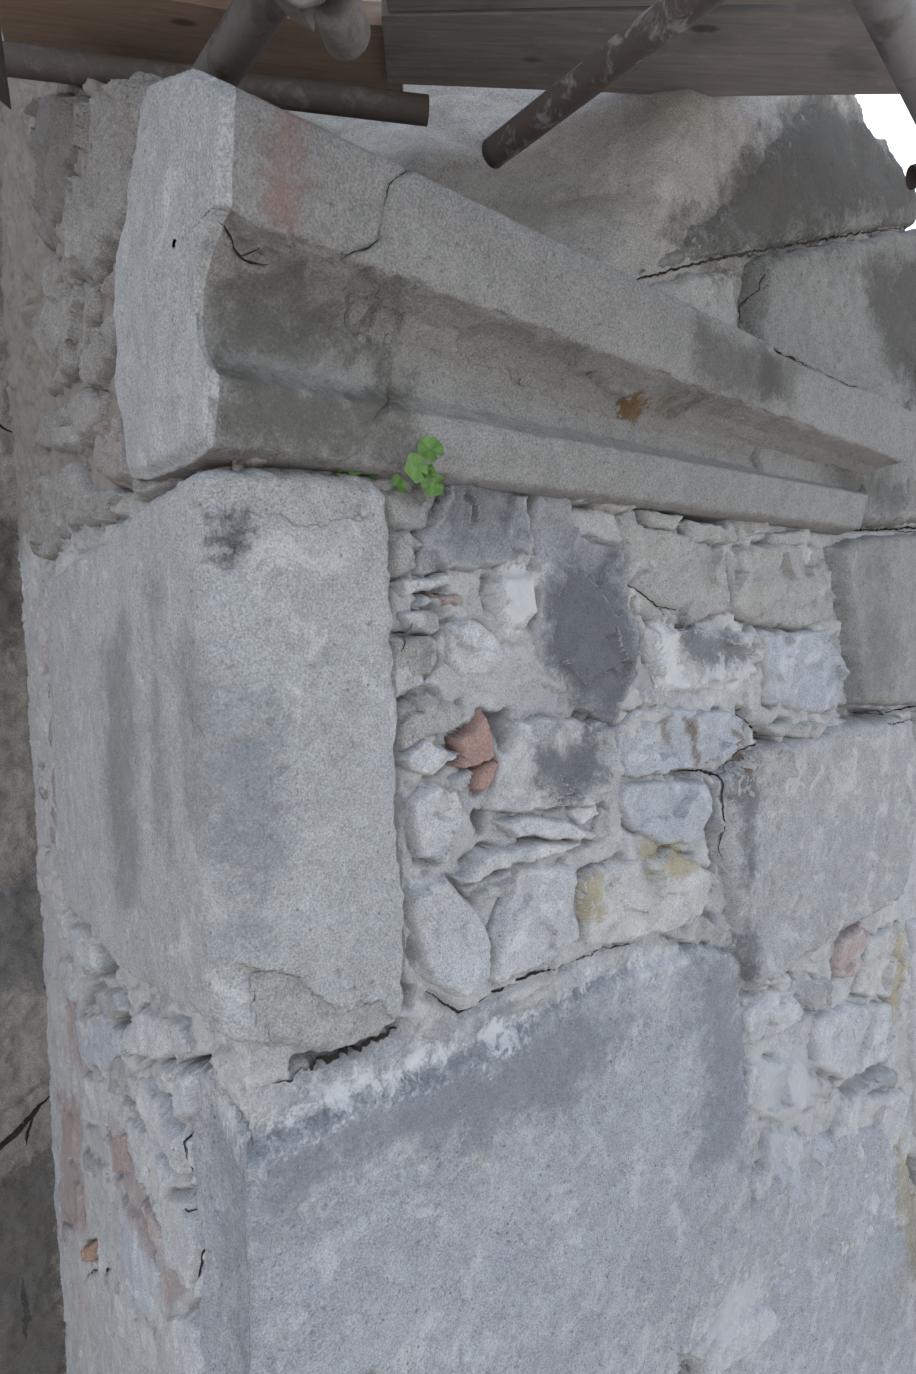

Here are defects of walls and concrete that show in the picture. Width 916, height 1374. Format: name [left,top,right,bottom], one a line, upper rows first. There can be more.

crack [219,222,268,266]
crack [342,171,407,260]
water stain [664,95,916,272]
crack [637,226,905,387]
rust [617,391,649,422]
crack [673,709,760,858]
crack [275,1027,397,1083]
crack [197,1248,205,1278]